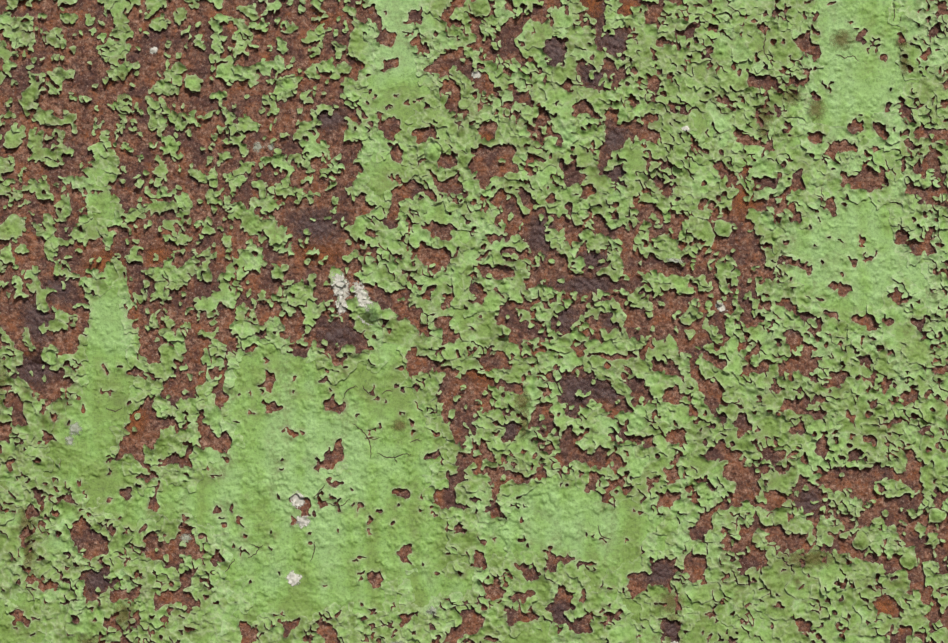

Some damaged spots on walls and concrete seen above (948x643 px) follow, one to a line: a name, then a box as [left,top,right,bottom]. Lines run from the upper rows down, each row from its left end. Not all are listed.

peeling [807,0,948,297]
corrosion [733,188,753,213]
corrosion [91,253,117,273]
corrosion [304,245,335,262]
corrosion [127,409,144,430]
peeling [158,409,232,476]
corrosion [467,368,491,383]
peeling [851,308,897,395]
peeling [871,371,948,438]
peeling [0,453,225,643]
peeling [358,536,624,643]
peeling [238,610,344,643]